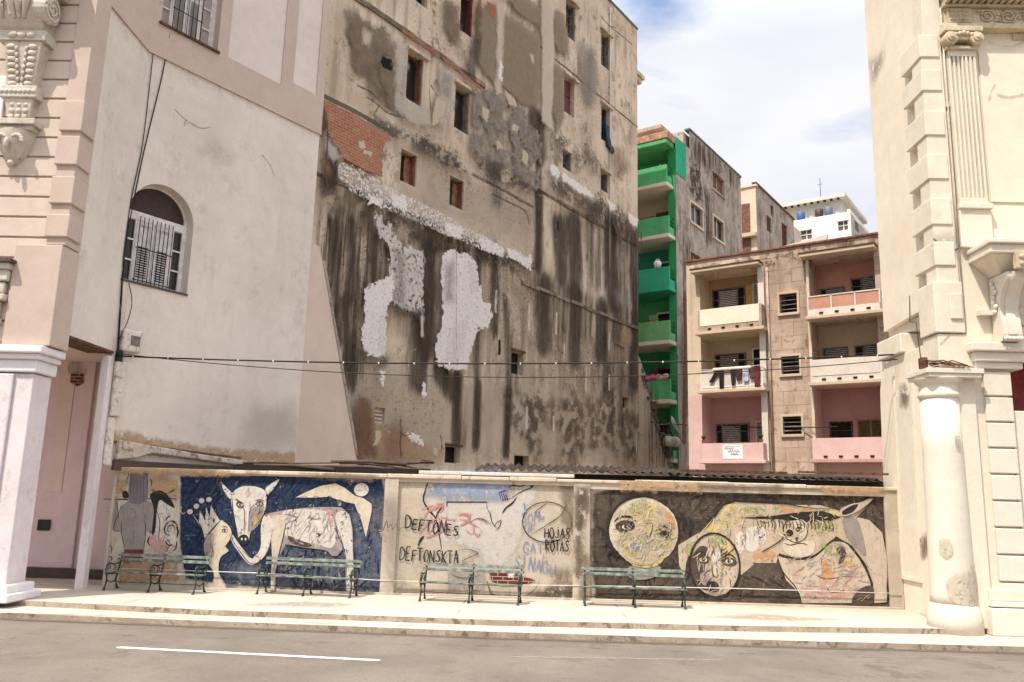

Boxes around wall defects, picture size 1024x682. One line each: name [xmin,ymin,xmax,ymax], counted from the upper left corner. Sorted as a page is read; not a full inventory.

peeling [550,164,593,197]
peeling [324,94,532,387]
leakage [320,44,688,467]
peeling [114,431,295,462]
peeling [939,539,953,559]
peeling [946,565,978,607]